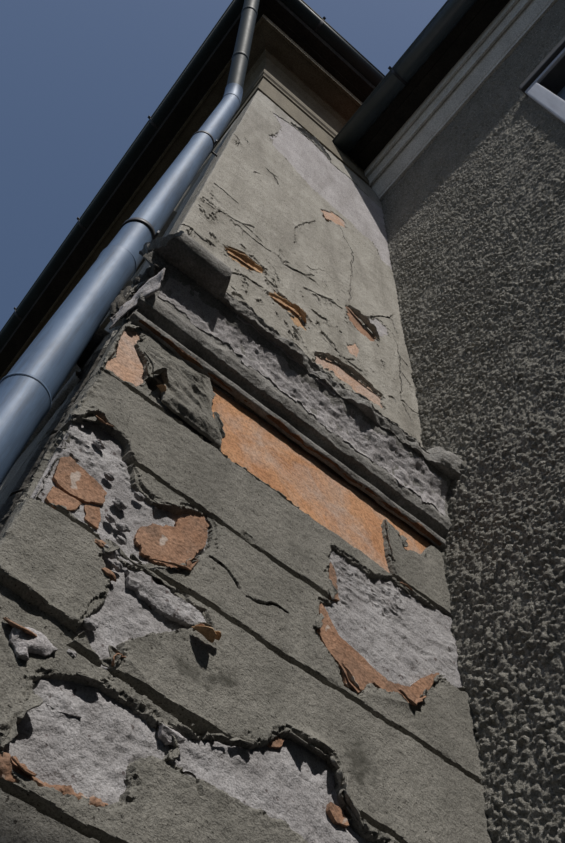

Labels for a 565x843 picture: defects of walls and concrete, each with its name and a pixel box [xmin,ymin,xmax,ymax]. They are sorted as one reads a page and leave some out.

peeling [225,245,264,273]
crack [279,235,354,305]
peeling [105,265,448,517]
crack [370,315,419,421]
spalling [31,415,222,670]
spalling [212,386,463,706]
spalling [3,617,77,662]
spalling [0,671,372,843]